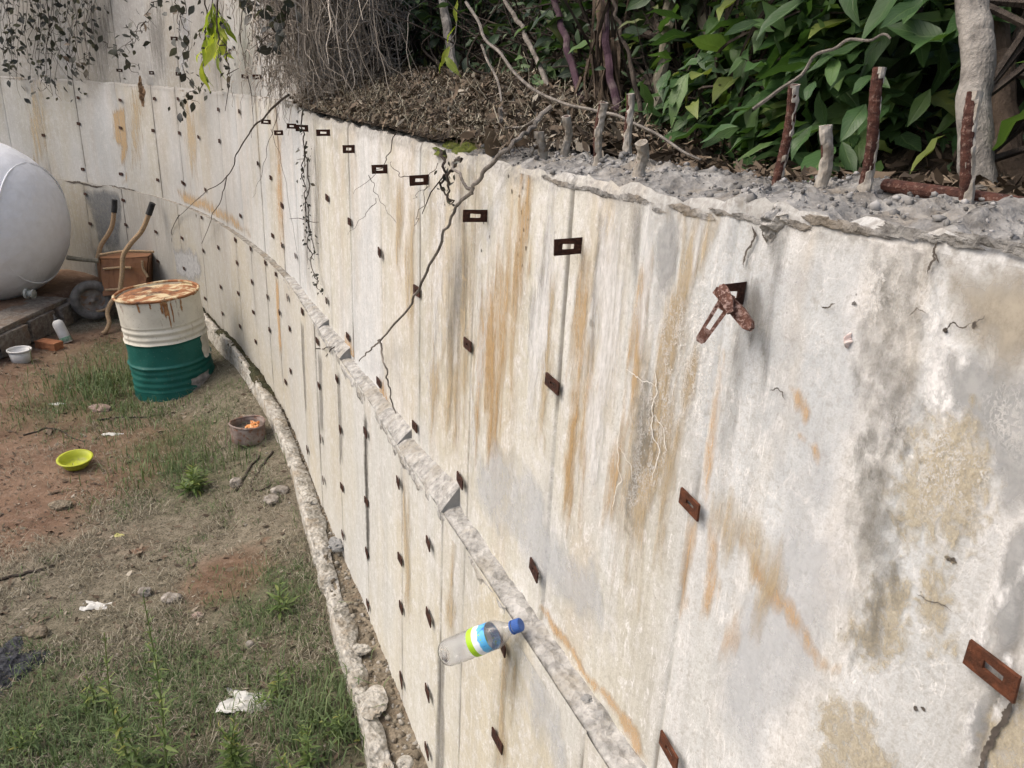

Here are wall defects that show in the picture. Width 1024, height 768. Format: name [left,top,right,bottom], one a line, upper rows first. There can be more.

rust [113,91,139,164]
spalling [541,175,1024,258]
rust [431,173,529,452]
rust [541,290,554,421]
rust [609,231,707,545]
water stain [859,316,1024,557]
water stain [844,560,957,669]
water stain [979,529,1024,669]
water stain [966,705,1001,750]